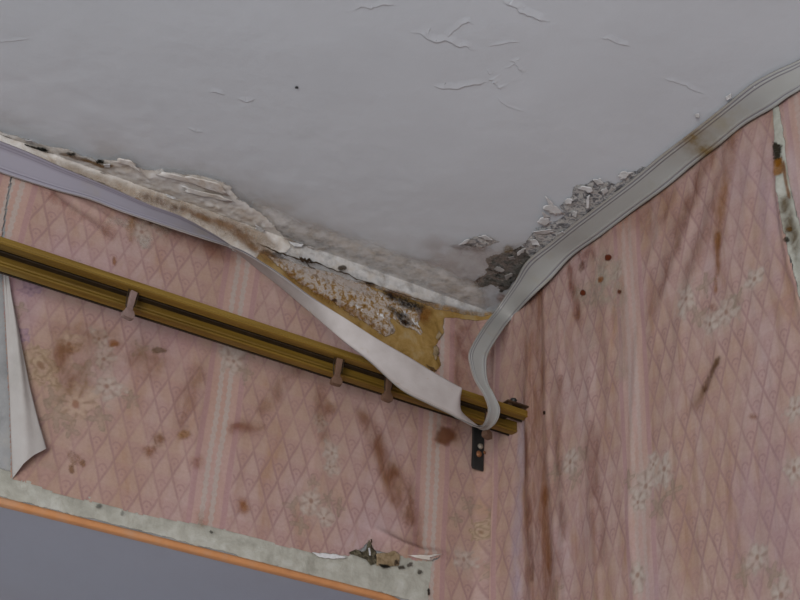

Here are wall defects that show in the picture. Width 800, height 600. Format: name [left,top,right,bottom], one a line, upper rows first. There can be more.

flaking render [0,131,646,373]
leakage [383,291,429,325]
flaking render [0,275,440,600]
leakage [437,428,454,444]